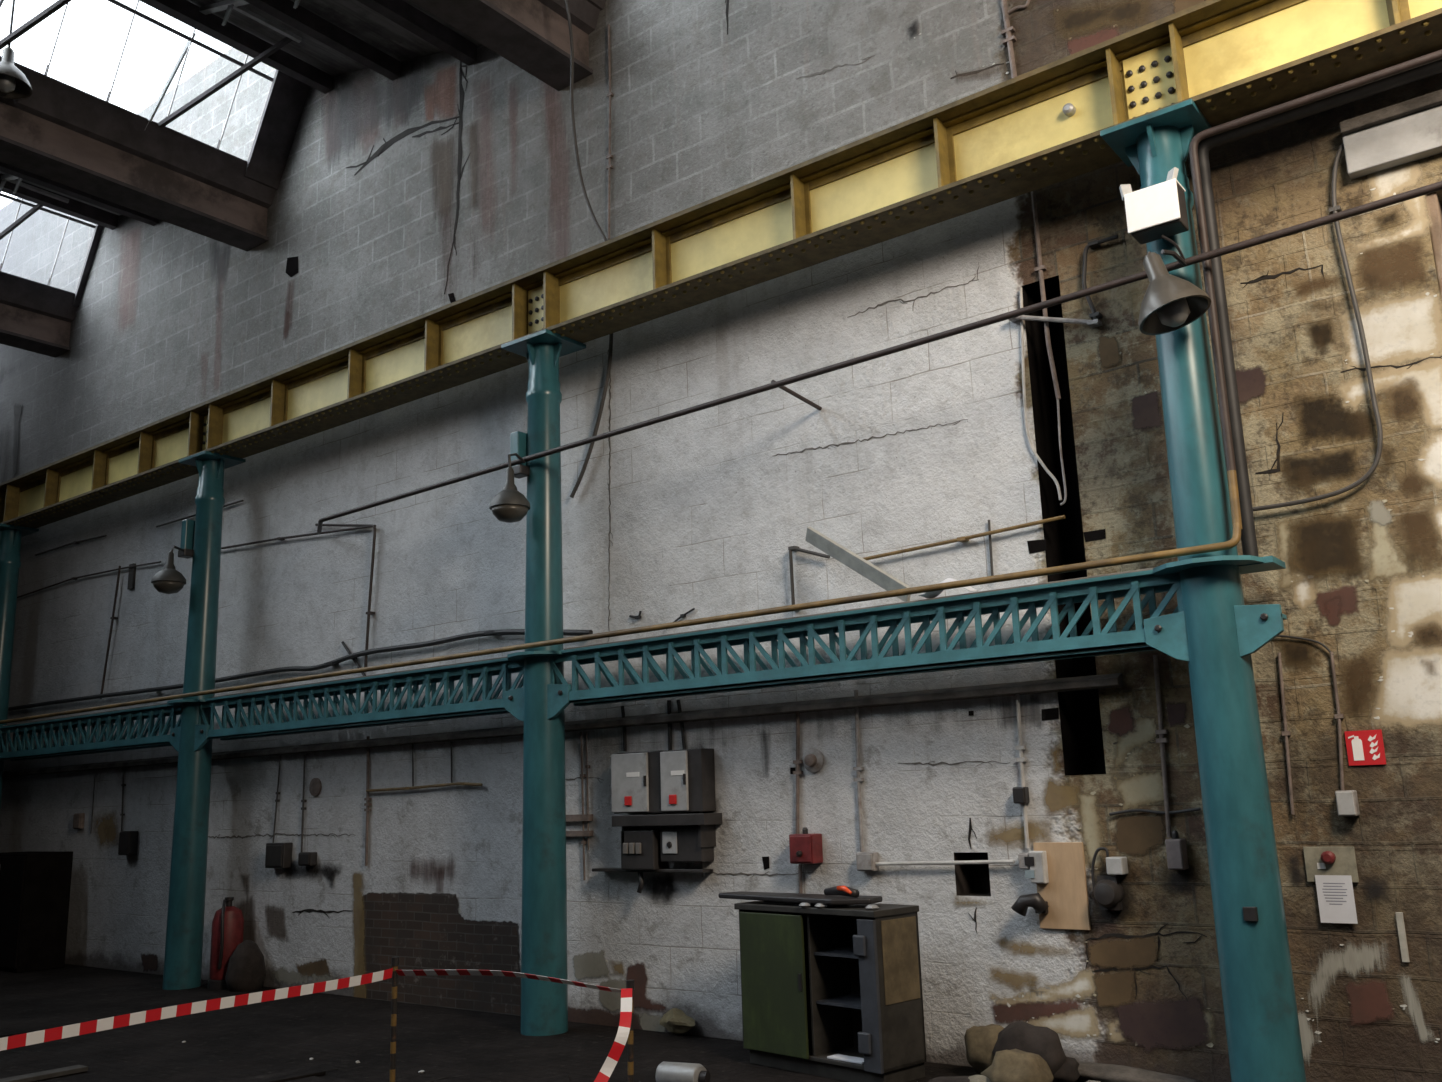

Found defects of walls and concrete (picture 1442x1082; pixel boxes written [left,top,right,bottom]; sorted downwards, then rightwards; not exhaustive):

crack [346,61,470,294]
crack [1240,265,1324,288]
crack [774,419,968,456]
crack [1255,414,1283,474]
peeling [1337,290,1442,540]
water stain [1279,636,1317,668]
water stain [1289,514,1364,626]
peeling [1365,499,1442,728]
water stain [1397,472,1442,564]
water stain [1415,624,1442,645]
flaking render [271,872,521,1016]
flaking render [991,937,1158,1042]